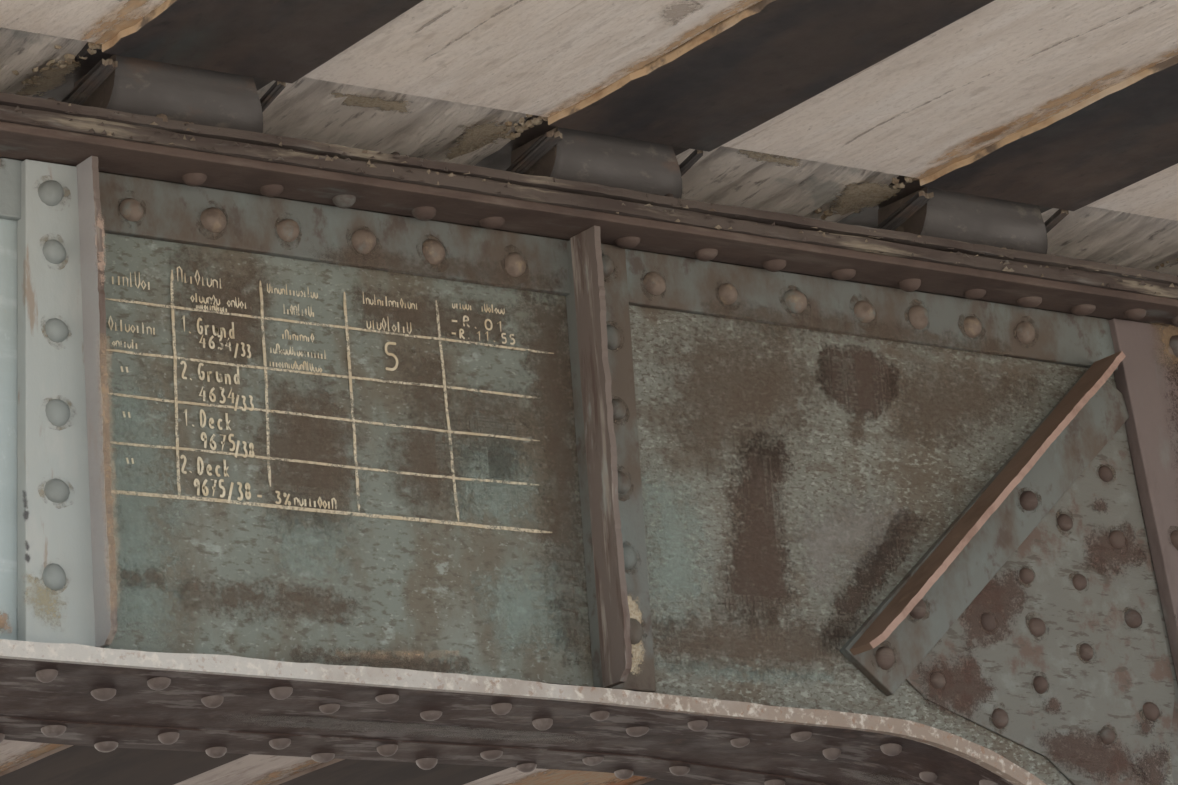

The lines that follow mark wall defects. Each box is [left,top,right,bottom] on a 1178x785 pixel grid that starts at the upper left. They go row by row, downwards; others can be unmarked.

corrosion [1084,523,1147,575]
corrosion [917,571,1025,718]
corrosion [1040,730,1169,785]